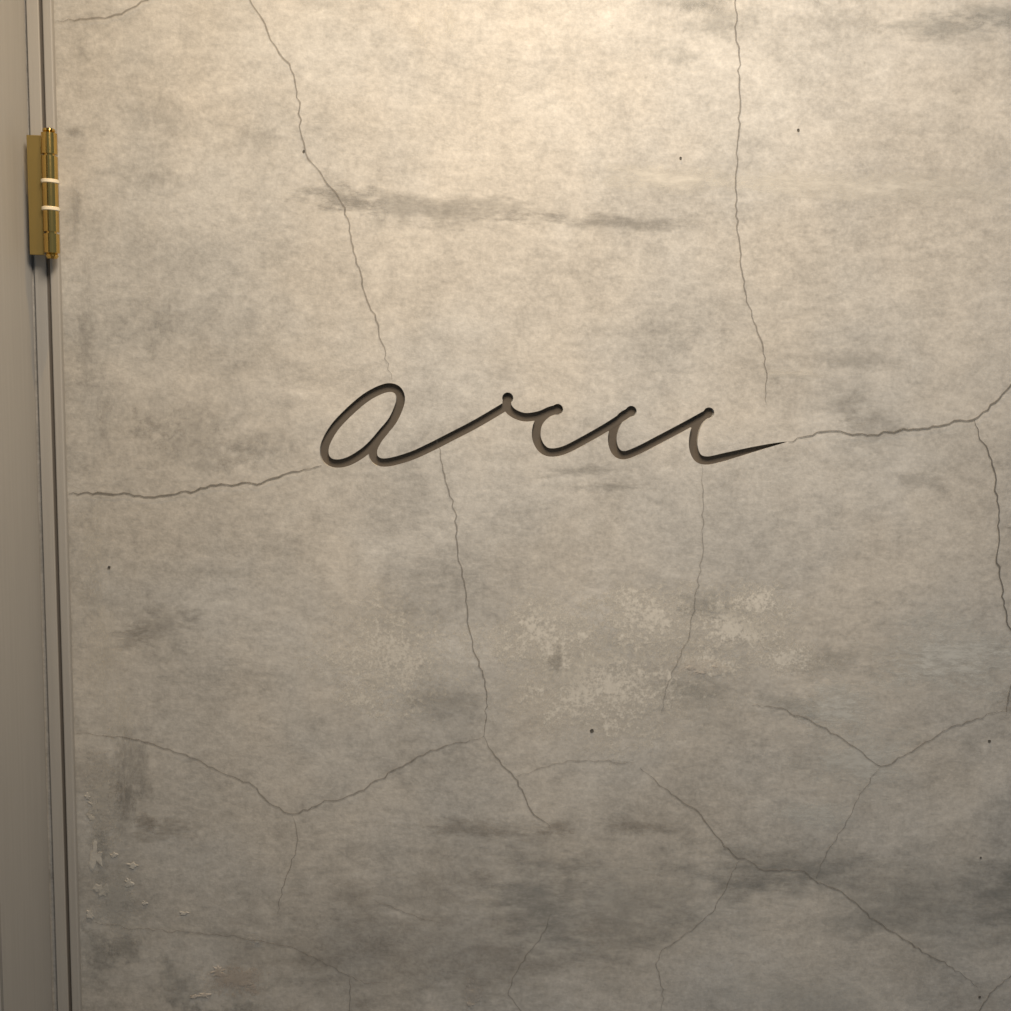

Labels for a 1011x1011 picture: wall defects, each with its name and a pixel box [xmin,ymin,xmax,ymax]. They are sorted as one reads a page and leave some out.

crack [69,465,322,498]
crack [789,384,1011,630]